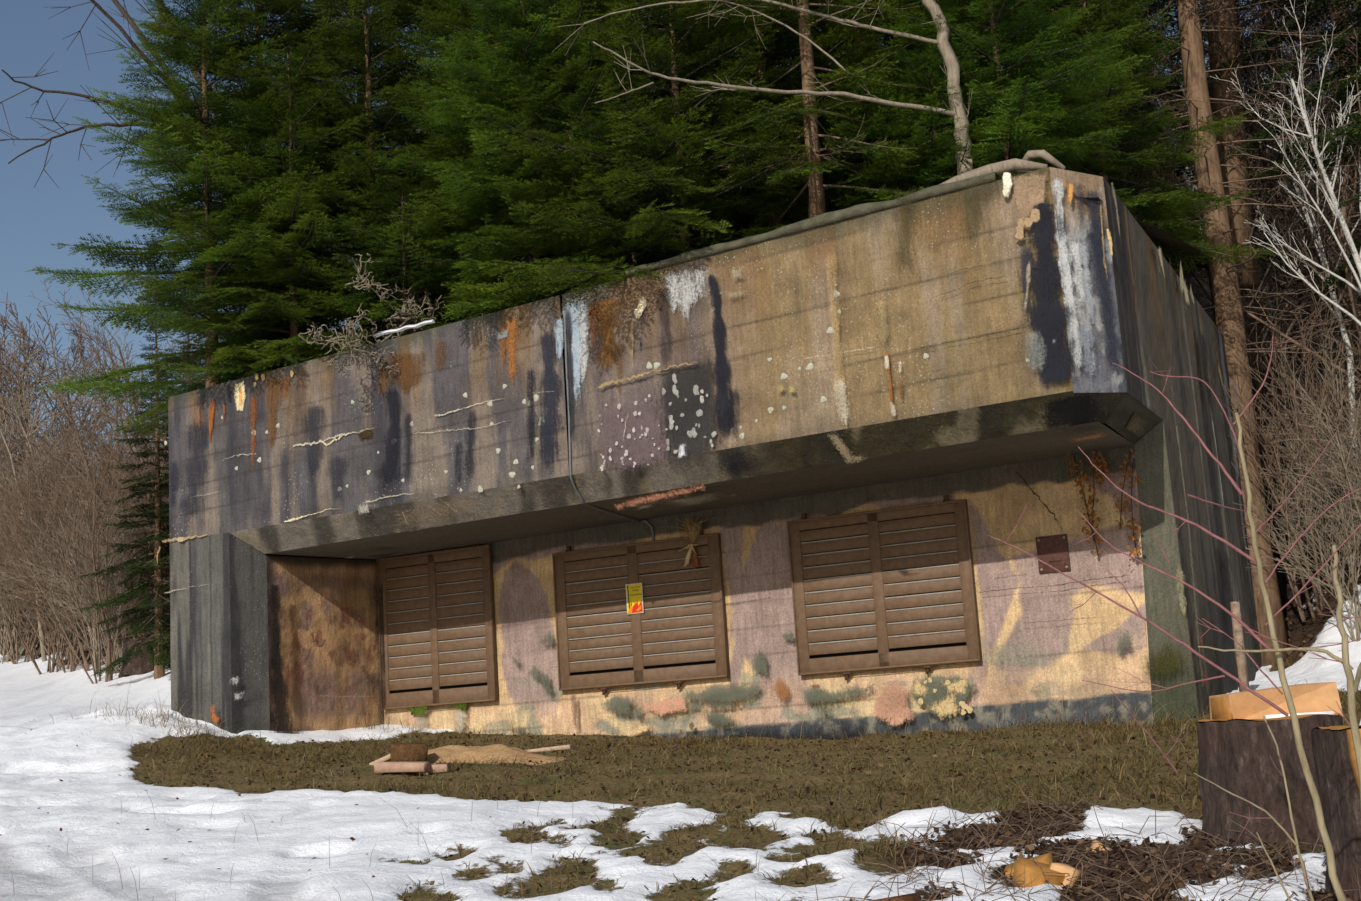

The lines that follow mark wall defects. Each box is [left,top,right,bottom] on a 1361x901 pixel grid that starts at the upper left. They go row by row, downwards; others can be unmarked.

spalling [1002,172,1047,240]
leakage [376,389,411,486]
corrosion [500,319,518,377]
leakage [526,301,590,468]
peeling [597,373,717,471]
leakage [666,267,742,440]
leakage [1018,179,1124,429]